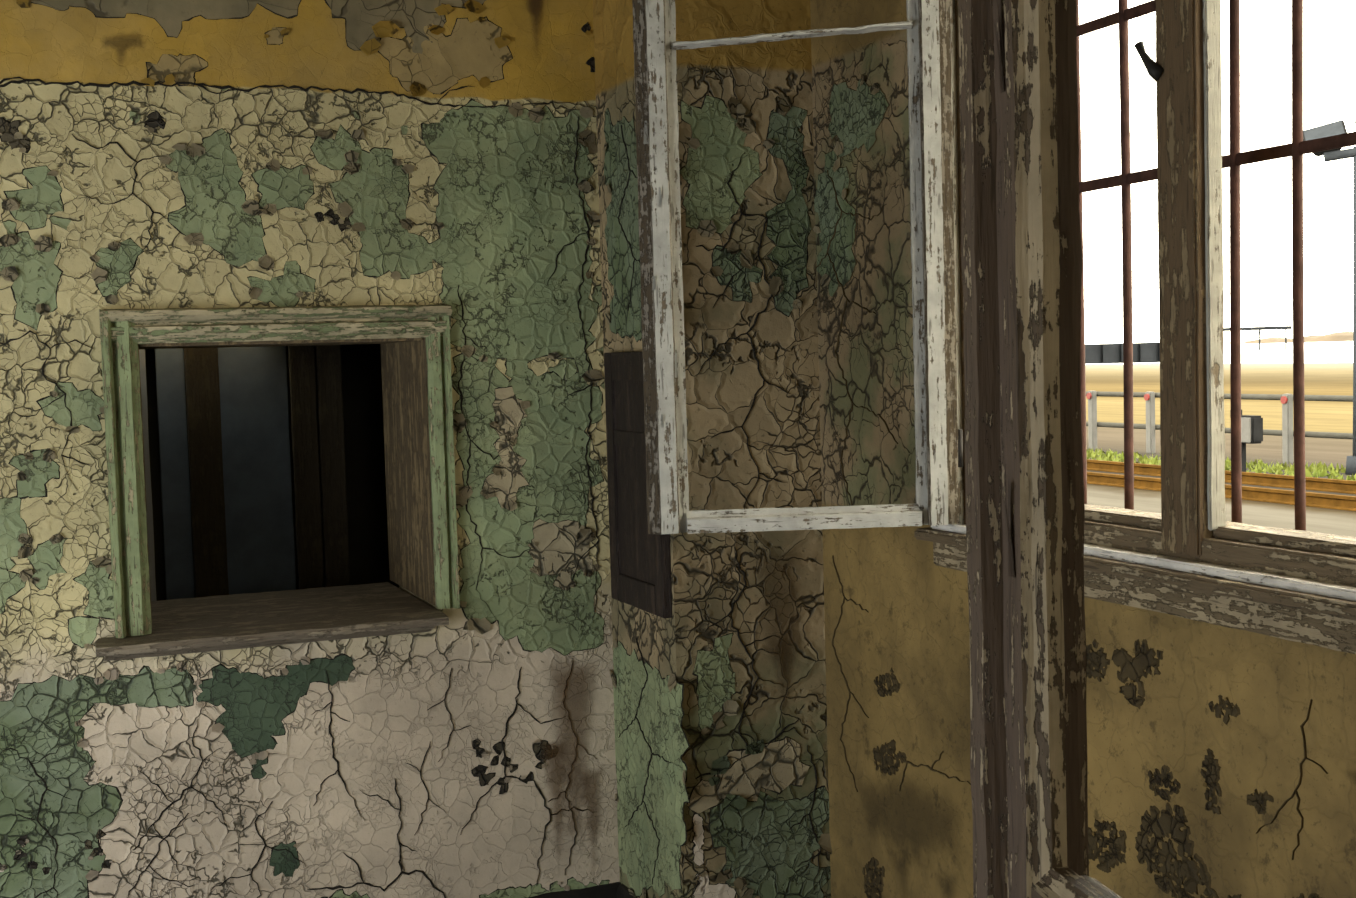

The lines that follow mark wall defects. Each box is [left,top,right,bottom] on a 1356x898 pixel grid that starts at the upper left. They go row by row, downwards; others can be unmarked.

peeling [0,117,64,331]
peeling [0,448,115,649]
peeling [36,381,104,433]
peeling [89,238,144,305]
flaking render [144,110,166,134]
flaking render [16,0,301,45]
peeling [159,0,832,898]
crack [696,152,790,508]
crack [816,170,899,505]
peeling [0,653,355,898]
crack [128,547,869,898]
crack [1256,699,1328,860]